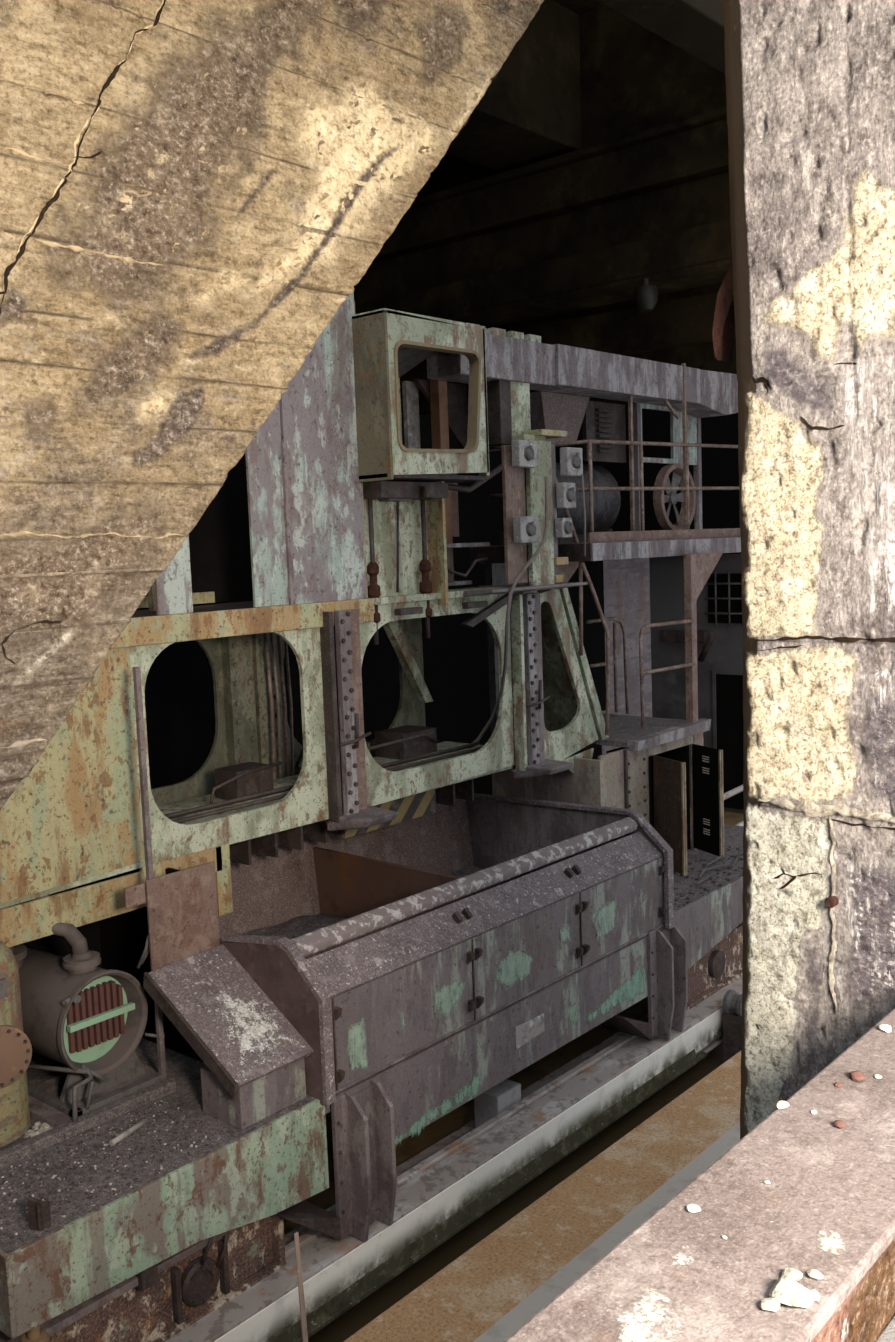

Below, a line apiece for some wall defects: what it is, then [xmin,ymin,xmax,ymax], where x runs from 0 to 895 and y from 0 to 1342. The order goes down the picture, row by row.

crack [0,0,166,314]